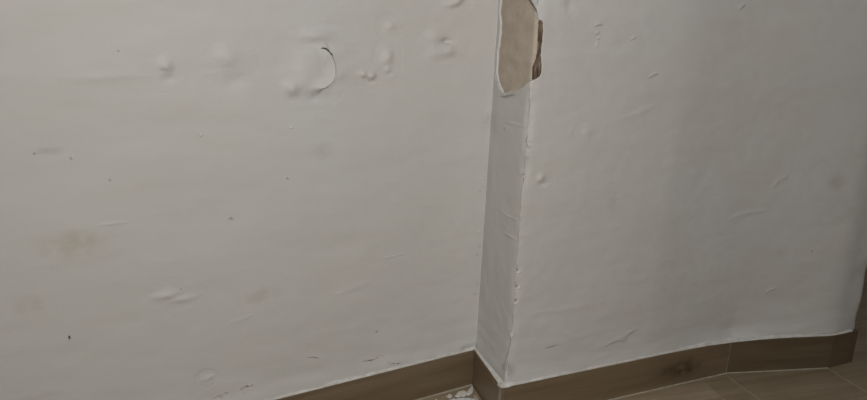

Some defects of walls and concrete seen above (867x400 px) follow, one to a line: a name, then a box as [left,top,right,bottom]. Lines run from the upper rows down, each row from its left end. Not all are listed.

peeling [495,0,548,98]